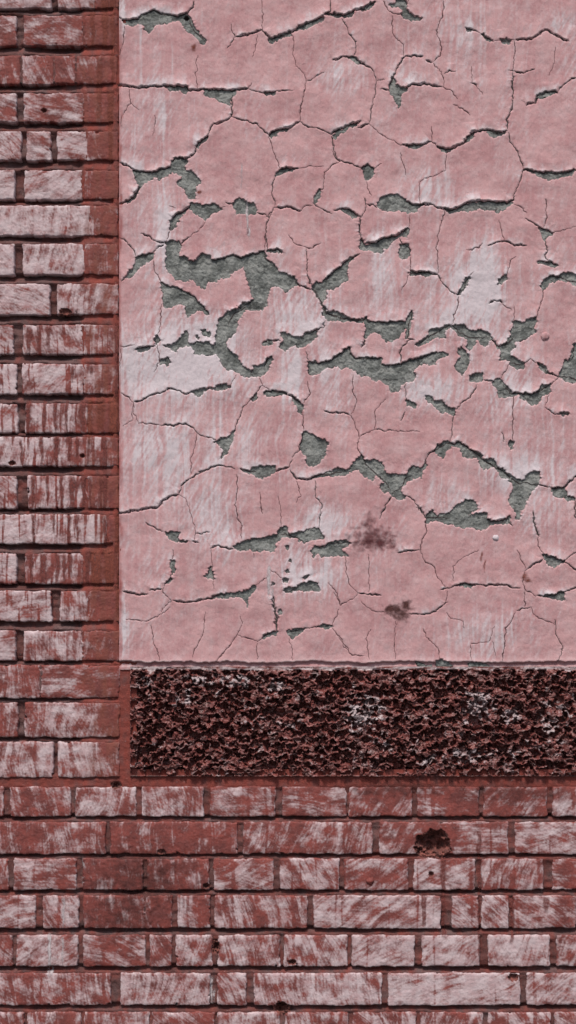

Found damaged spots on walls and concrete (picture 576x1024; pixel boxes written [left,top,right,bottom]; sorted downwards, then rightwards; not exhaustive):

peeling [115,2,207,56]
peeling [382,0,458,109]
crack [117,0,574,286]
crack [417,199,575,322]
crack [119,344,235,426]
crack [263,378,420,456]
peeling [119,152,576,608]
crack [118,465,234,543]
crack [123,588,172,661]
crack [193,521,563,661]